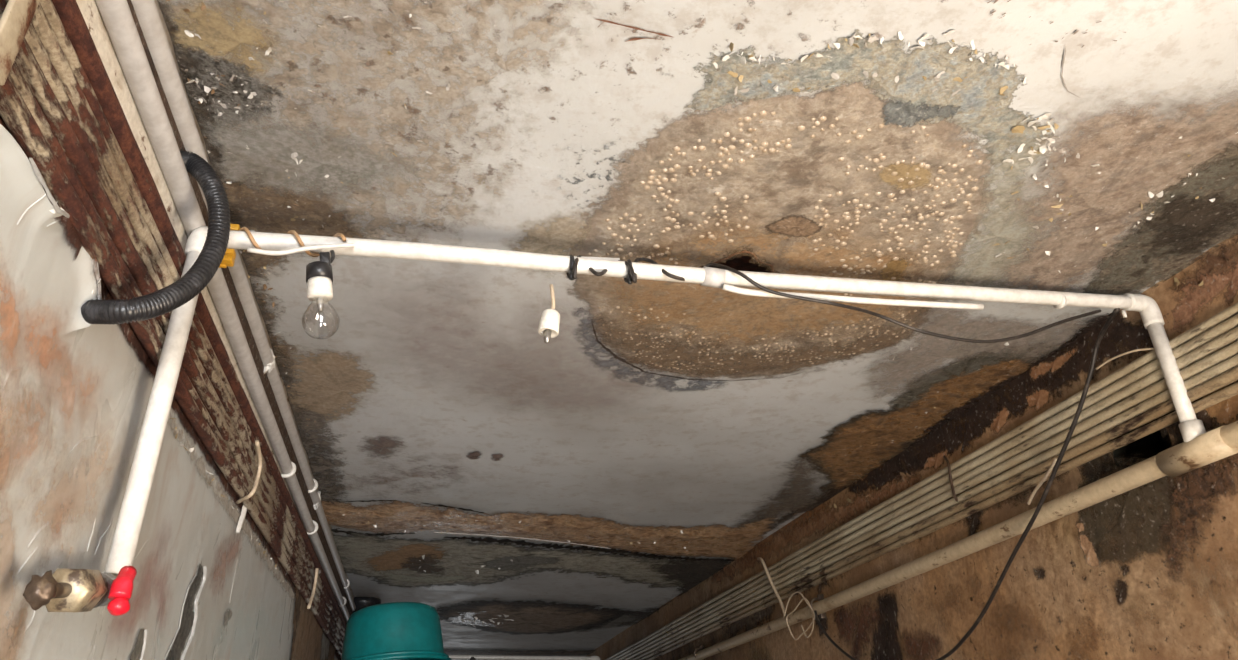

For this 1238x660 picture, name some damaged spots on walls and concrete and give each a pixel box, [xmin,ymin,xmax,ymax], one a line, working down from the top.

damp [157,0,575,242]
peeling [683,30,1059,166]
corrosion [0,284,93,416]
corrosion [41,184,114,300]
corrosion [119,323,157,379]
damp [239,249,374,504]
damp [515,81,1238,496]
corrosion [171,397,296,594]
peeling [331,514,702,589]
damp [437,558,727,635]
damp [815,591,941,660]
damp [960,438,1146,536]